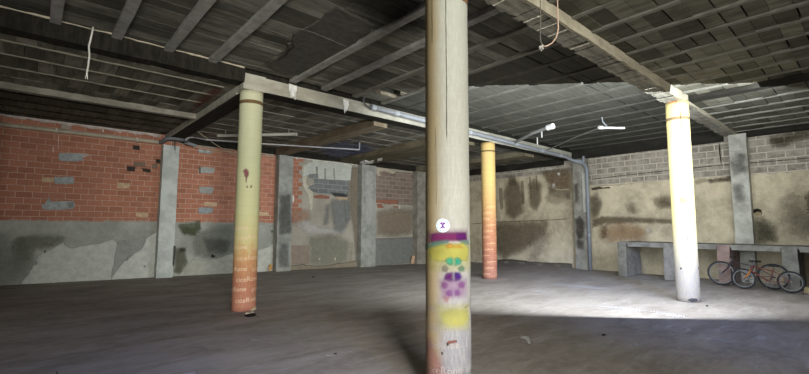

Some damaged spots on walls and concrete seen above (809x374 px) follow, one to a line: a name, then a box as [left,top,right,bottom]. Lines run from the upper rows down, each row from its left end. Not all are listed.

peeling [301,161,352,210]
water stain [496,175,570,257]
water stain [15,236,60,249]
peeling [21,232,157,284]